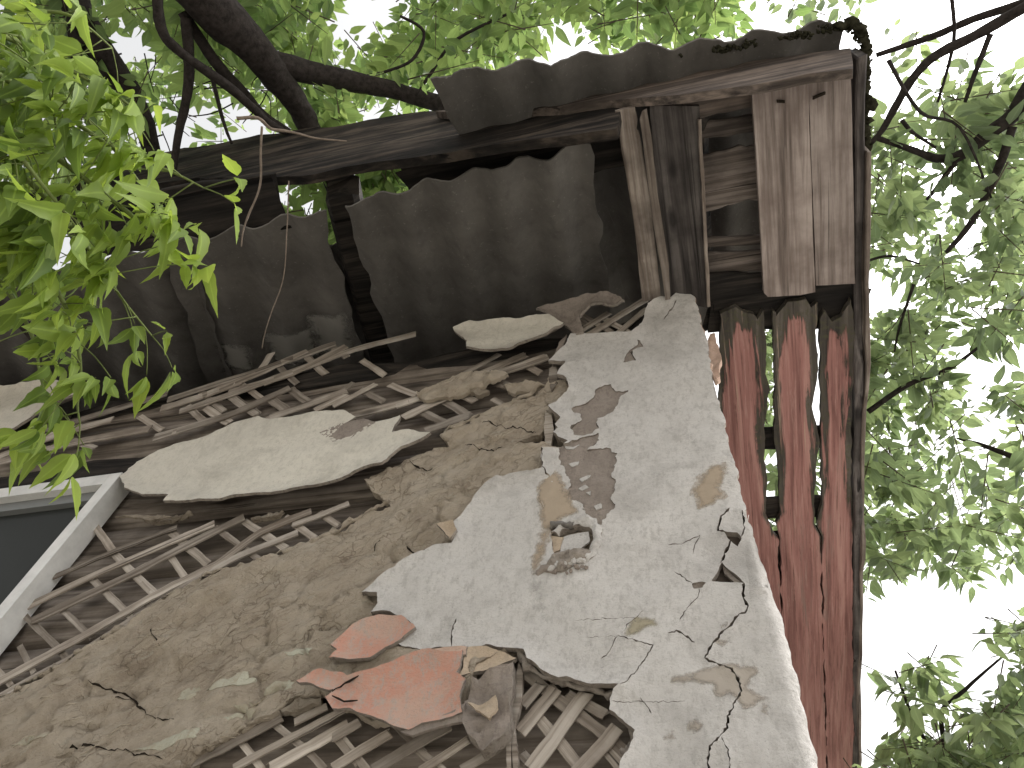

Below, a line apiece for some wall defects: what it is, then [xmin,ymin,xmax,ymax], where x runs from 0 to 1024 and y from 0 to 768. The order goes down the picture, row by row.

crack [467,421,547,475]
spalling [0,291,626,768]
crack [717,511,745,561]
crack [88,680,173,721]
crack [707,586,748,766]